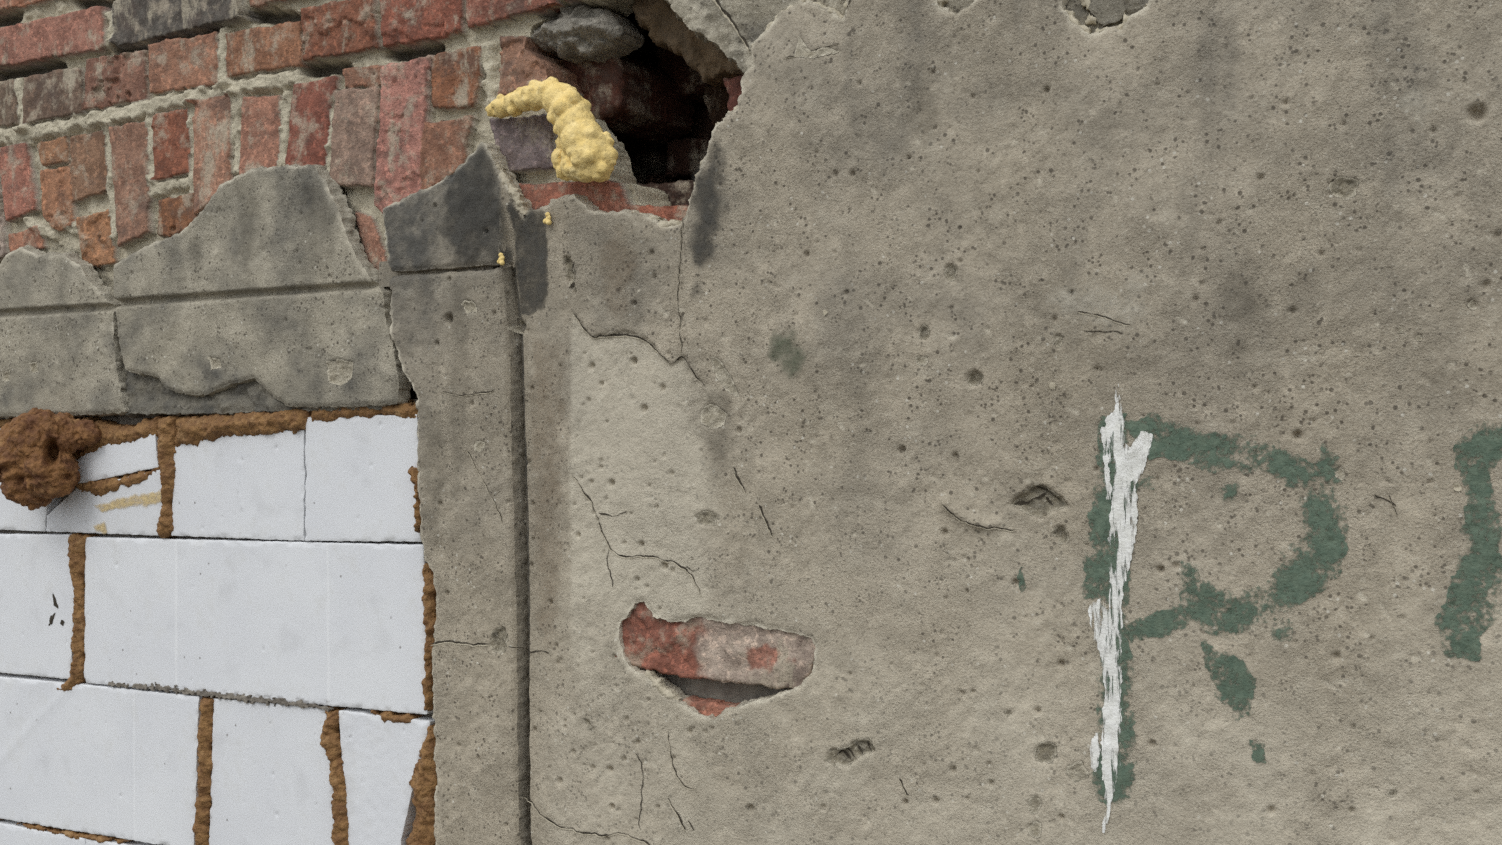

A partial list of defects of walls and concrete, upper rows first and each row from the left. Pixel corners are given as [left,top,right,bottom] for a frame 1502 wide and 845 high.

flaking render [937,0,974,14]
flaking render [1065,0,1149,34]
spalling [531,0,847,206]
flaking render [563,257,577,292]
crack [569,217,705,386]
flaking render [120,348,397,418]
crack [571,476,702,598]
flaking render [615,602,816,717]